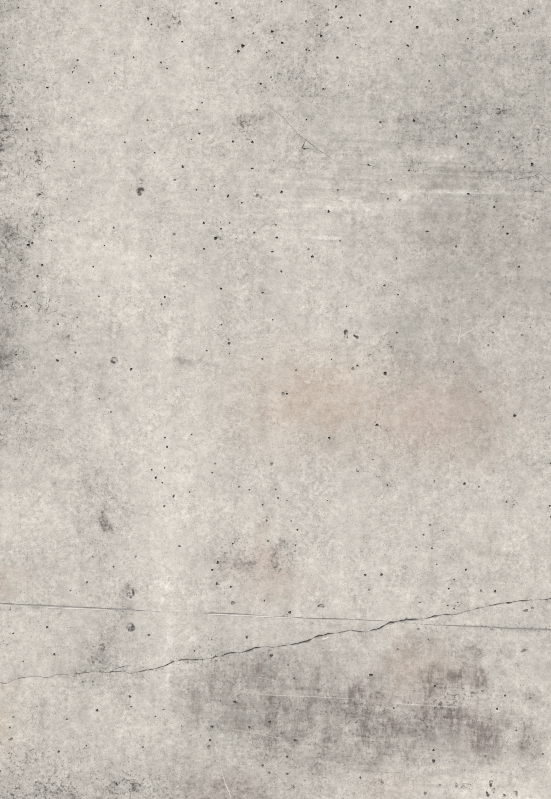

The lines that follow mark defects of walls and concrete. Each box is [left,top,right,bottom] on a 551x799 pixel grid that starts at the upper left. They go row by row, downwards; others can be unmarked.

crack [2,598,551,684]